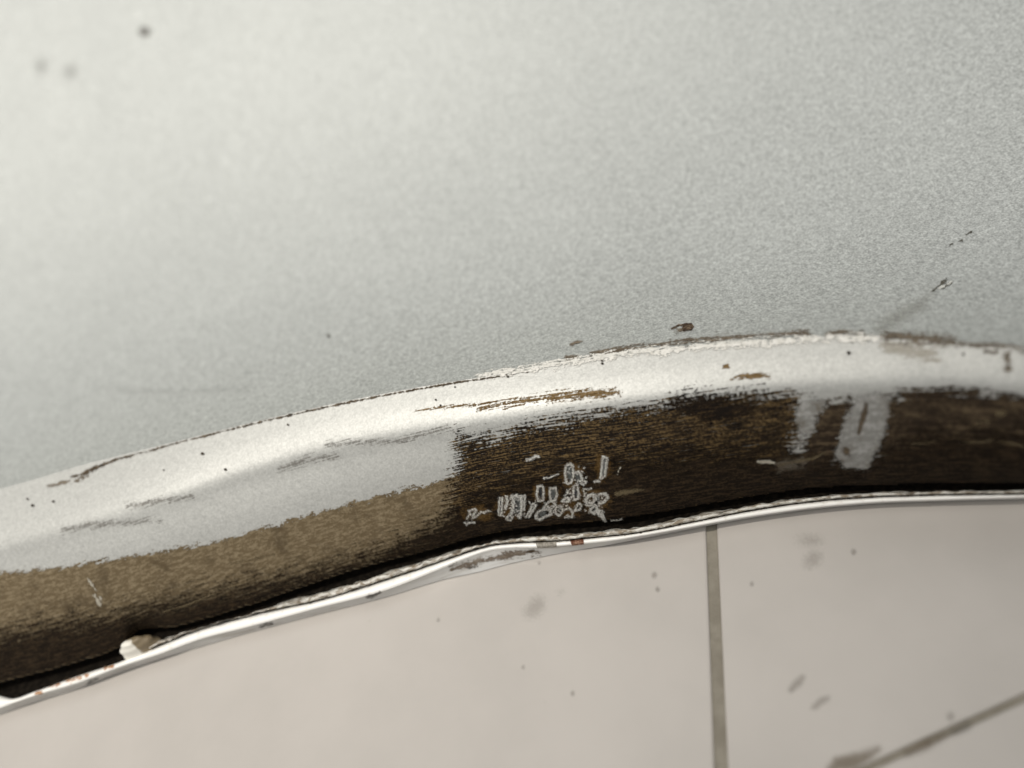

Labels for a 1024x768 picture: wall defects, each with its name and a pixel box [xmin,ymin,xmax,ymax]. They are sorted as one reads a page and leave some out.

damp [794,399,827,440]
damp [834,393,891,469]